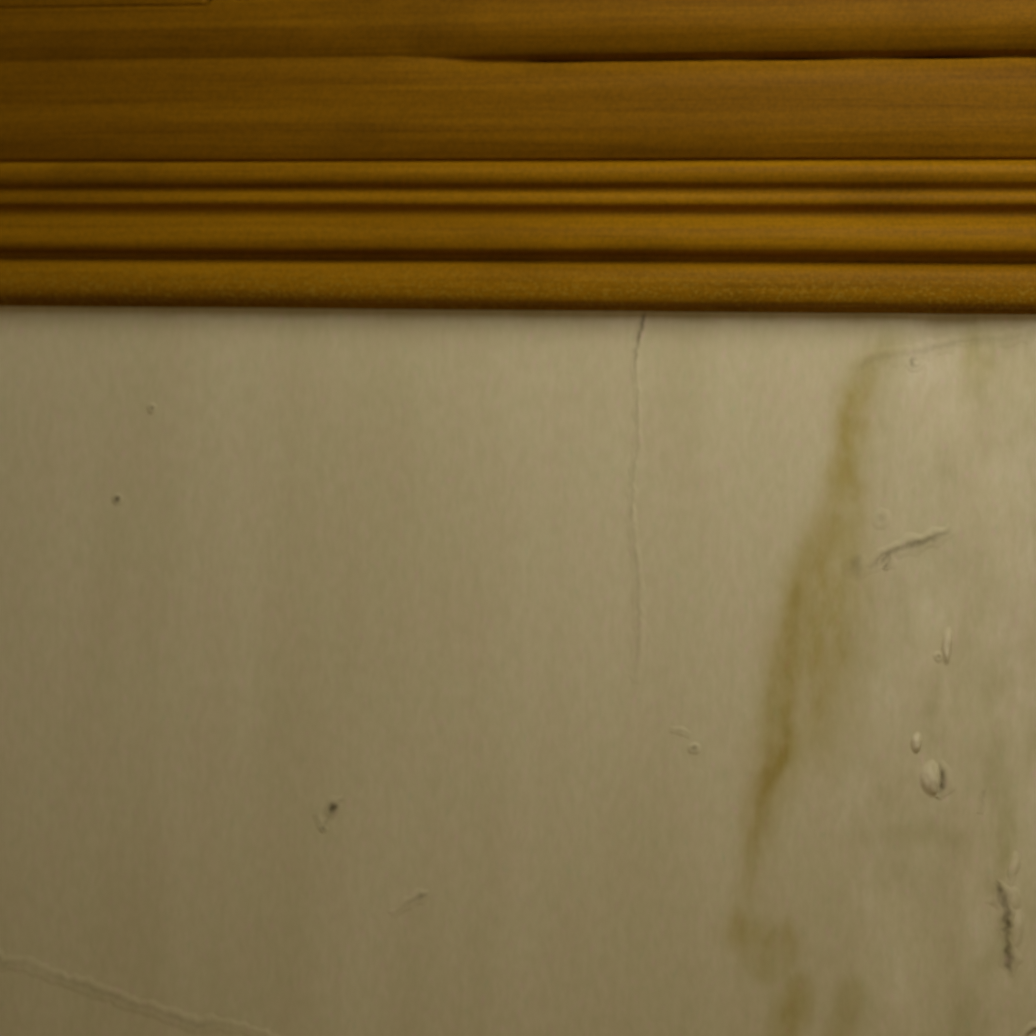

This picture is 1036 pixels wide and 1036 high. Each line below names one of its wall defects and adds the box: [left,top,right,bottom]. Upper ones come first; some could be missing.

crack [841,522,956,582]
leakage [701,327,922,1036]
crack [984,851,1026,978]